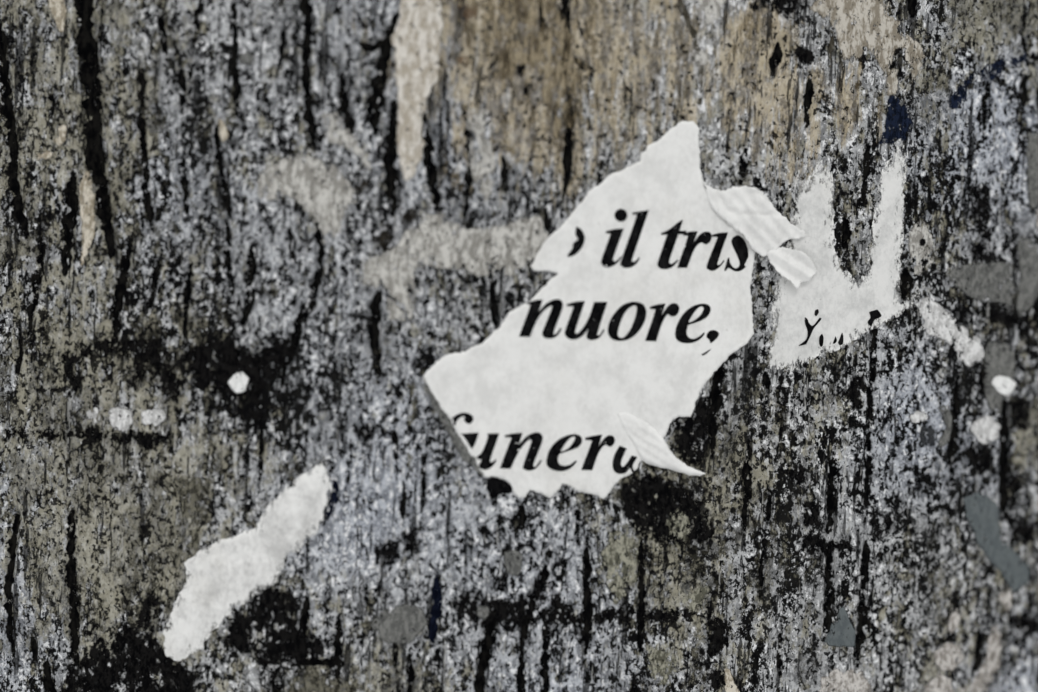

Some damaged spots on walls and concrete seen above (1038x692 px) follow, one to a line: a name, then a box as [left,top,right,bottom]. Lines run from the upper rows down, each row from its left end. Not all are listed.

peeling [467,108,496,202]